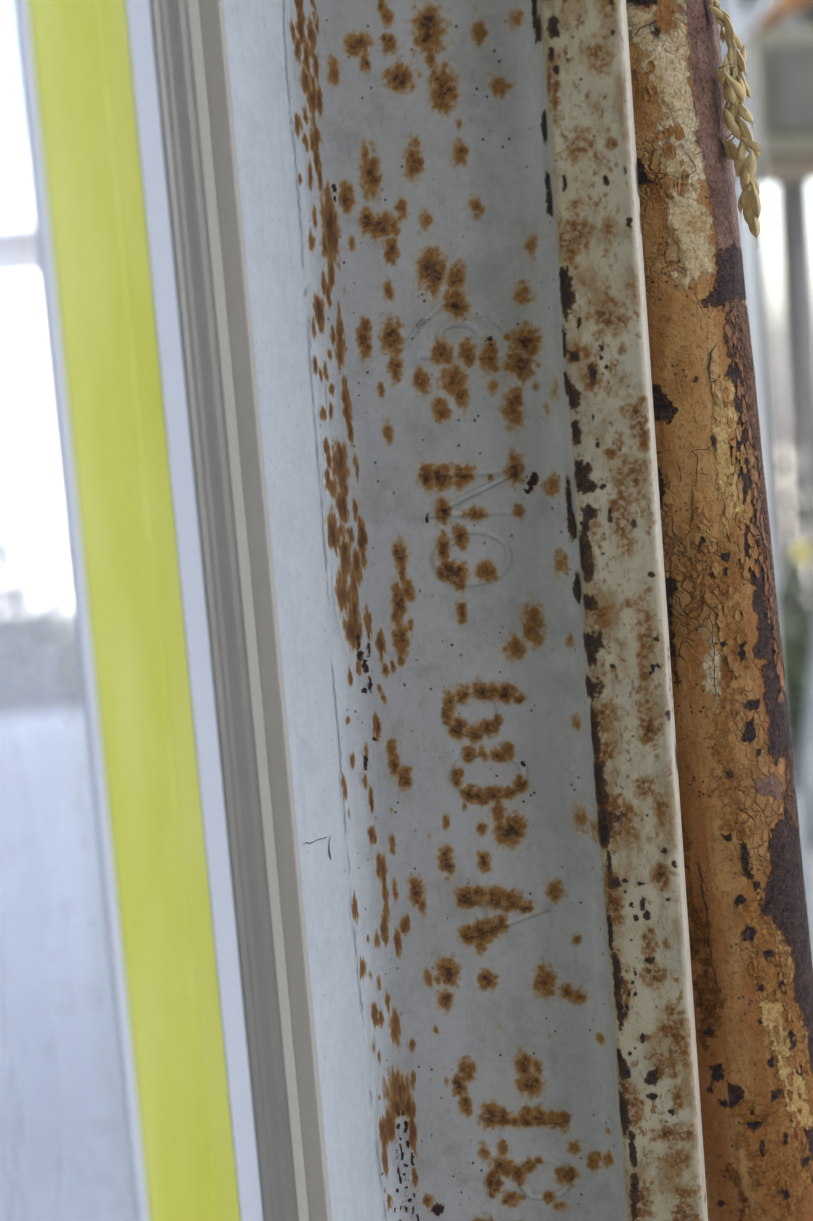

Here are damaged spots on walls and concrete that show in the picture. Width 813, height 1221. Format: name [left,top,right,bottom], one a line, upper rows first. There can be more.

rust [679,0,741,254]
rust [288,0,724,1221]
peeling [609,0,791,767]
crack [695,625,735,696]
rust [709,597,754,841]
rust [724,300,785,679]
rust [754,738,800,832]
peeling [706,1063,766,1157]
peeling [721,806,813,1182]
rust [726,899,813,1221]